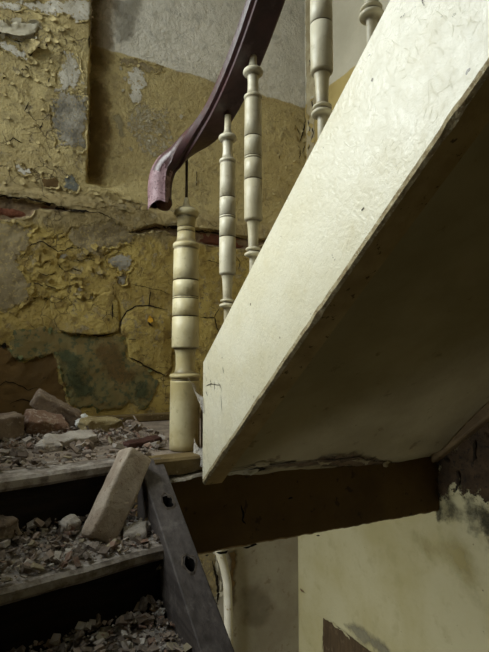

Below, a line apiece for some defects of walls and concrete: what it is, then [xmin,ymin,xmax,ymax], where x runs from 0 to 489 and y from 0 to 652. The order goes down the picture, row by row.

peeling [0,0,93,155]
peeling [118,57,165,106]
peeling [7,159,80,196]
peeling [0,180,148,316]
peeling [56,217,177,286]
flaking render [195,225,219,247]
flaking render [235,237,248,250]
flaking render [228,456,369,476]
flaking render [436,423,489,514]